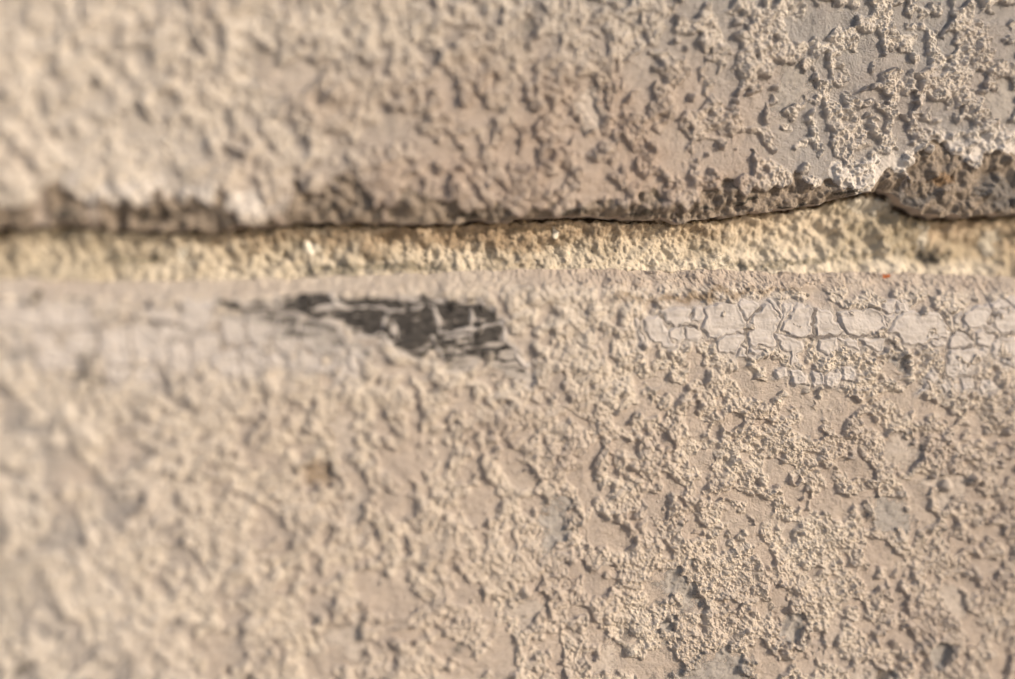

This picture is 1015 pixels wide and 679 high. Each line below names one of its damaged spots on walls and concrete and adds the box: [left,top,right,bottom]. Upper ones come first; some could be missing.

spalling [0,76,1015,233]
crack [0,218,657,238]
crack [686,191,1015,224]
crack [144,299,283,358]
peeling [0,285,539,397]
crack [658,305,762,359]
crack [777,307,886,353]
crack [939,312,1013,379]